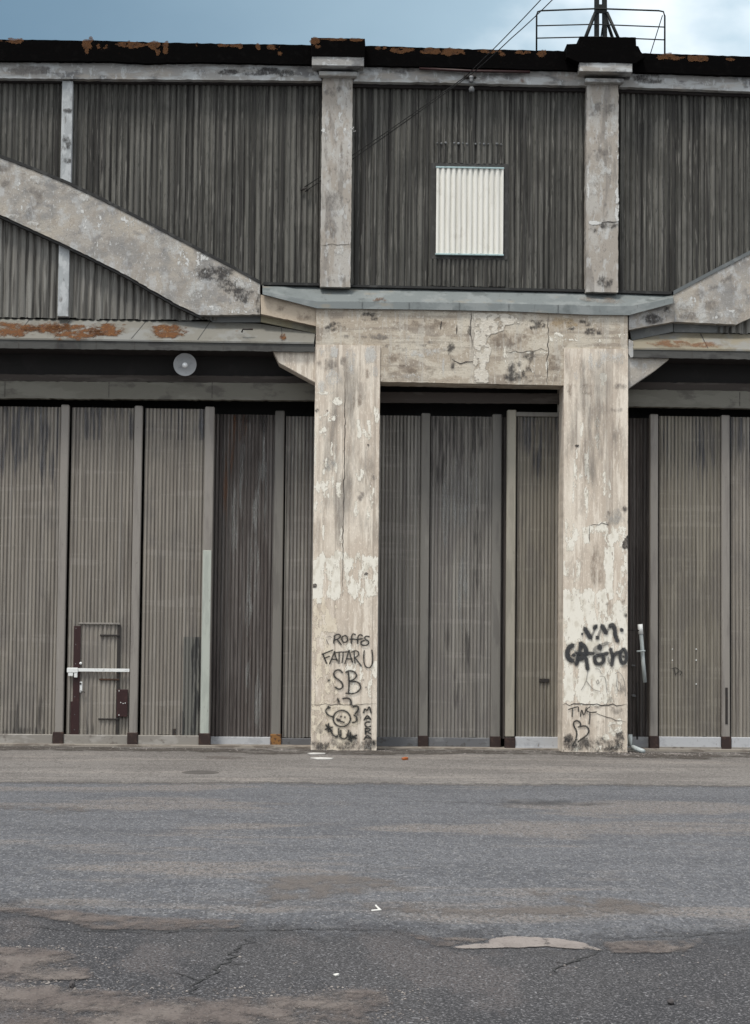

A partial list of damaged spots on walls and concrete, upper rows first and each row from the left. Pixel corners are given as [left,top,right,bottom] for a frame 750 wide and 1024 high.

corrosion [82,36,168,55]
corrosion [310,37,363,48]
corrosion [375,46,465,56]
corrosion [480,49,546,57]
corrosion [0,322,125,340]
corrosion [153,324,187,338]
crack [440,314,473,365]
crack [509,324,549,377]
peeling [311,391,380,750]
peeling [563,417,628,707]